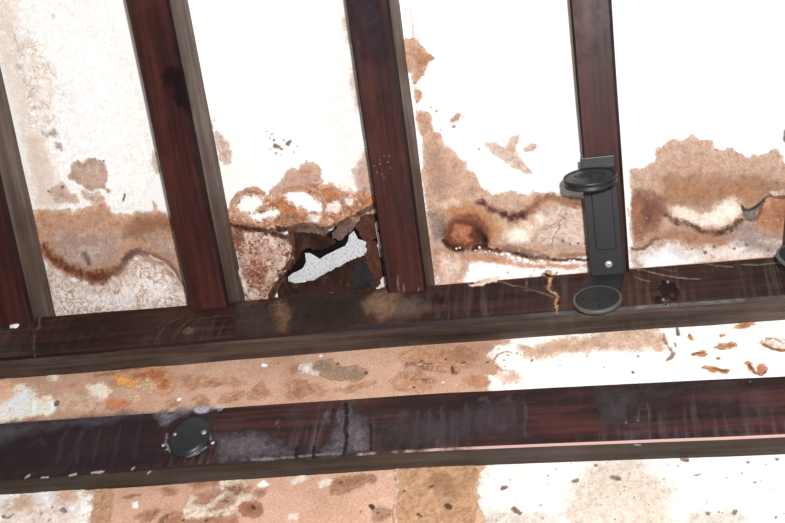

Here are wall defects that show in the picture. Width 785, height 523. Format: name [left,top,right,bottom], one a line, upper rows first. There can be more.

leakage [0,0,189,316]
leakage [268,161,323,197]
corrosion [441,214,492,253]
leakage [404,38,590,285]
leakage [629,134,785,268]